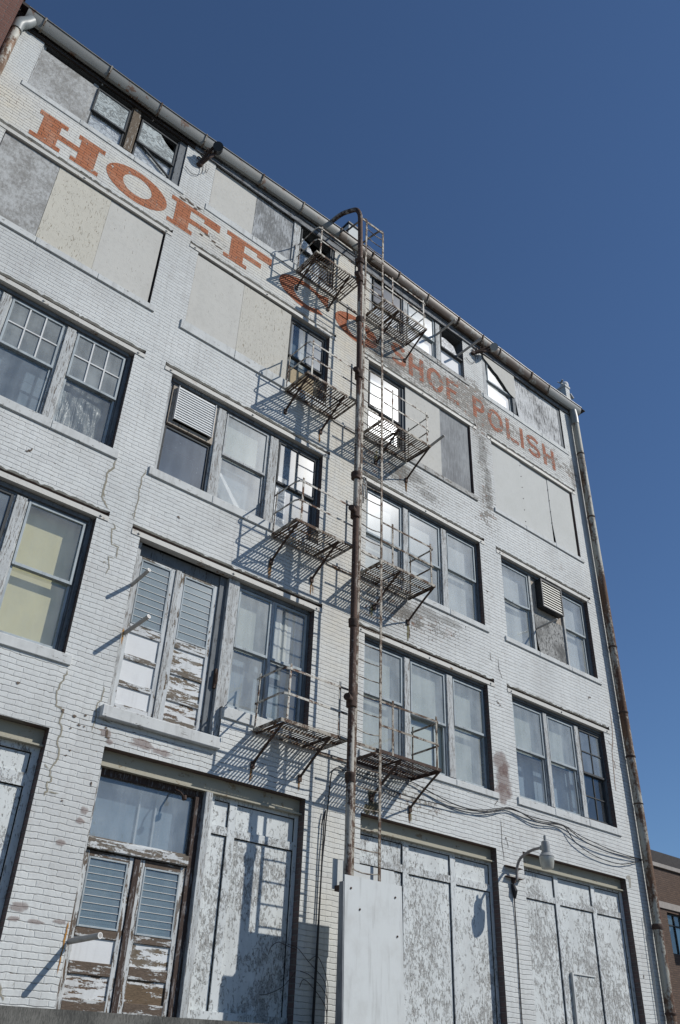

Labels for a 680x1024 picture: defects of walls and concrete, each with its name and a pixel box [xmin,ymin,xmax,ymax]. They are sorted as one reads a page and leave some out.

crack [101,461,146,573]
crack [44,672,68,795]